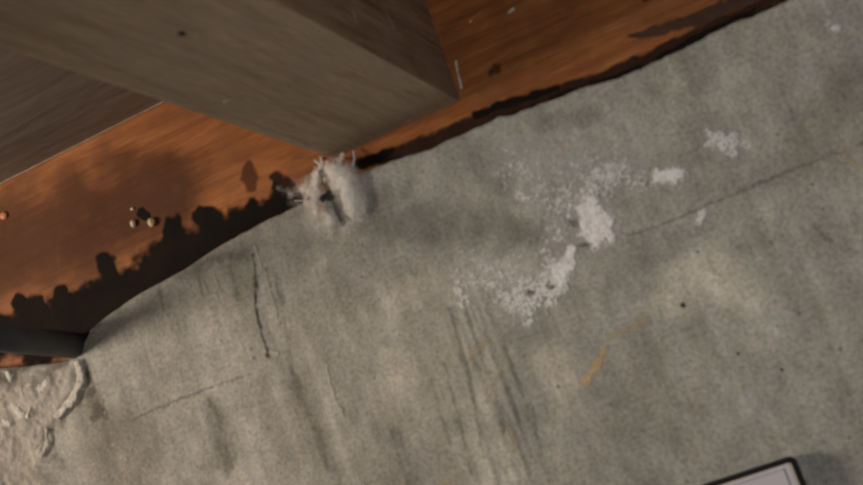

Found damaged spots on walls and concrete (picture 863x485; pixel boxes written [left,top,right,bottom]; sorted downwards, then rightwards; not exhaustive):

leakage [453,145,685,327]
leakage [693,209,707,232]
crack [252,245,279,358]